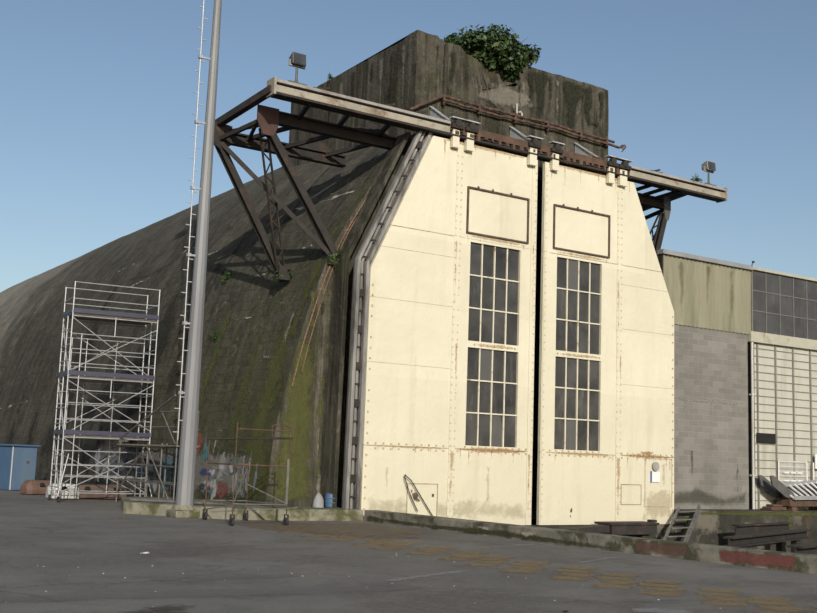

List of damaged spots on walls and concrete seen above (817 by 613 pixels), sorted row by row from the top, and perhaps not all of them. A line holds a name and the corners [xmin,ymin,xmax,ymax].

rust [449,124,630,175]
rust [460,448,530,466]